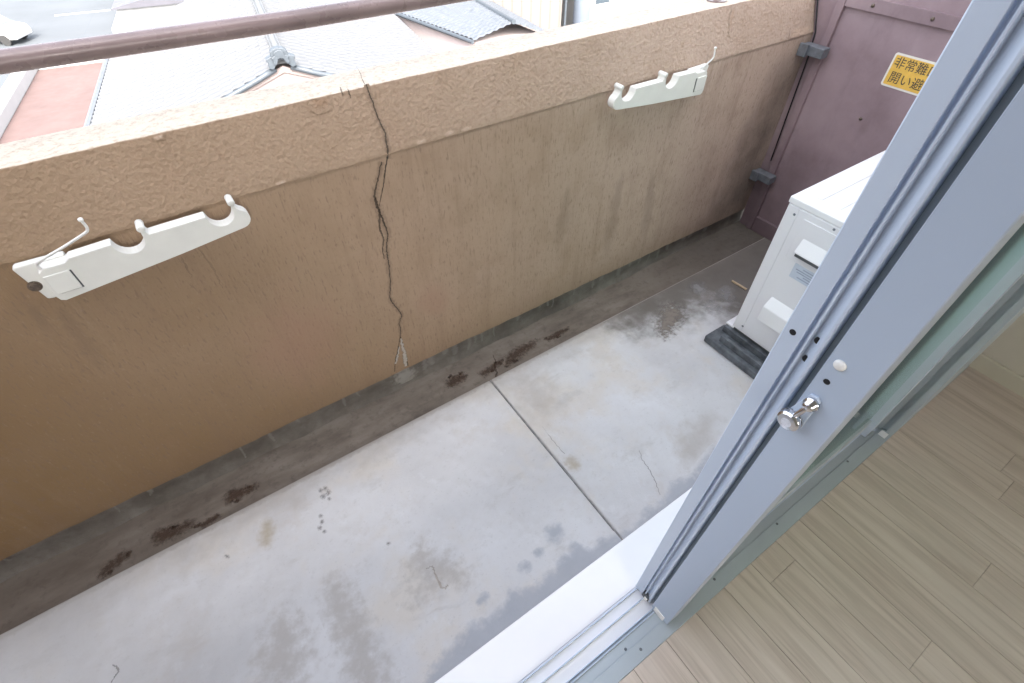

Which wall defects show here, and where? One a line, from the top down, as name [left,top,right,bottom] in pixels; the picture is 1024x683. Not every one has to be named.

crack [340,71,408,372]